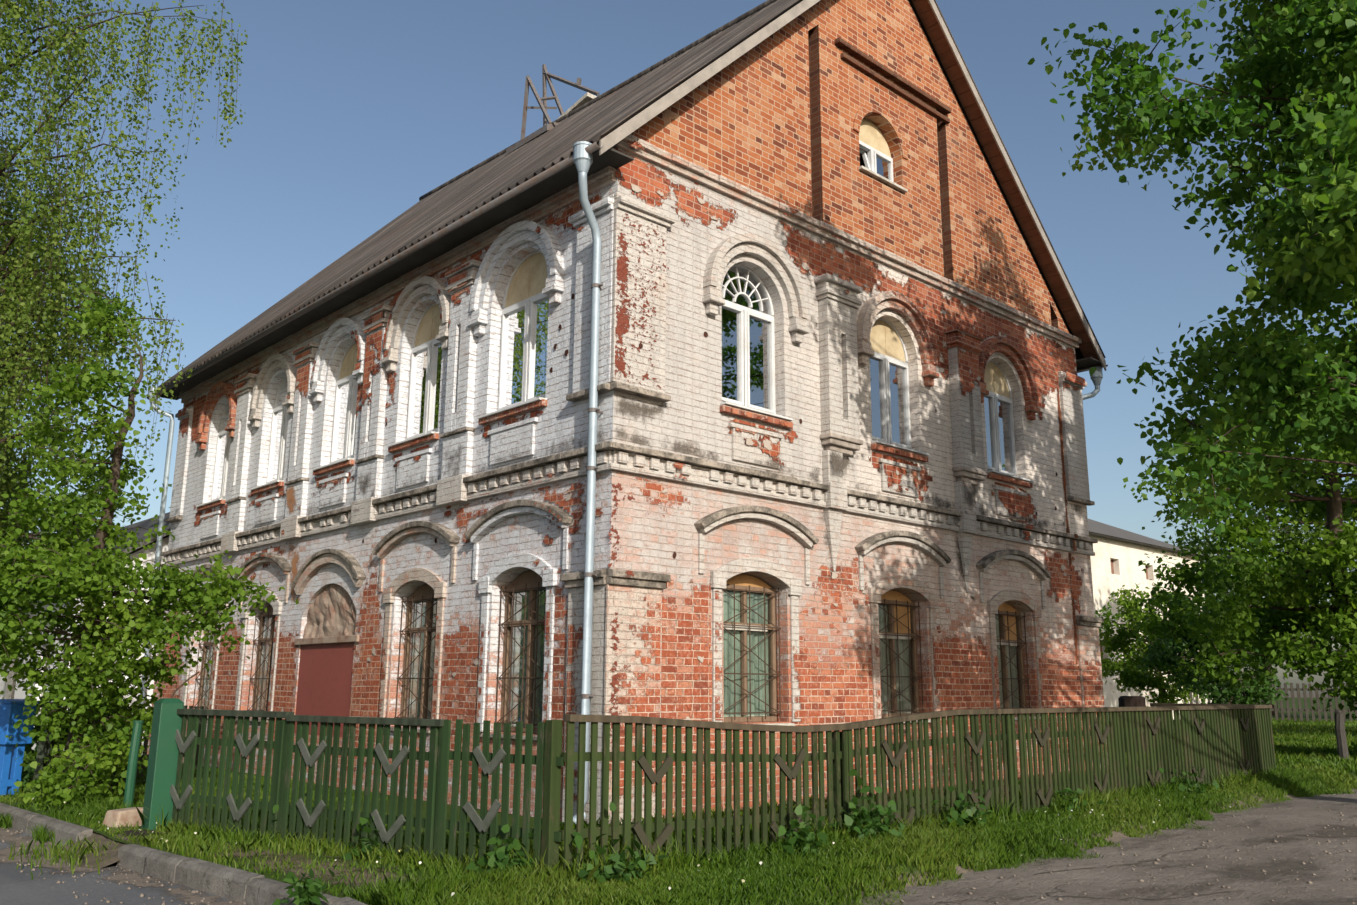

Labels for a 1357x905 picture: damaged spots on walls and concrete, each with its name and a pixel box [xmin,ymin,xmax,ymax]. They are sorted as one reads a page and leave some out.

peeling [615,140,738,231]
peeling [351,291,402,426]
spalling [615,213,669,390]
peeling [780,208,1085,420]
peeling [525,462,690,577]
peeling [868,450,933,512]
peeling [264,616,299,753]
peeling [347,572,392,772]
peeling [431,615,490,789]
peeling [533,559,583,801]
peeling [608,579,723,799]
peeling [792,557,882,785]